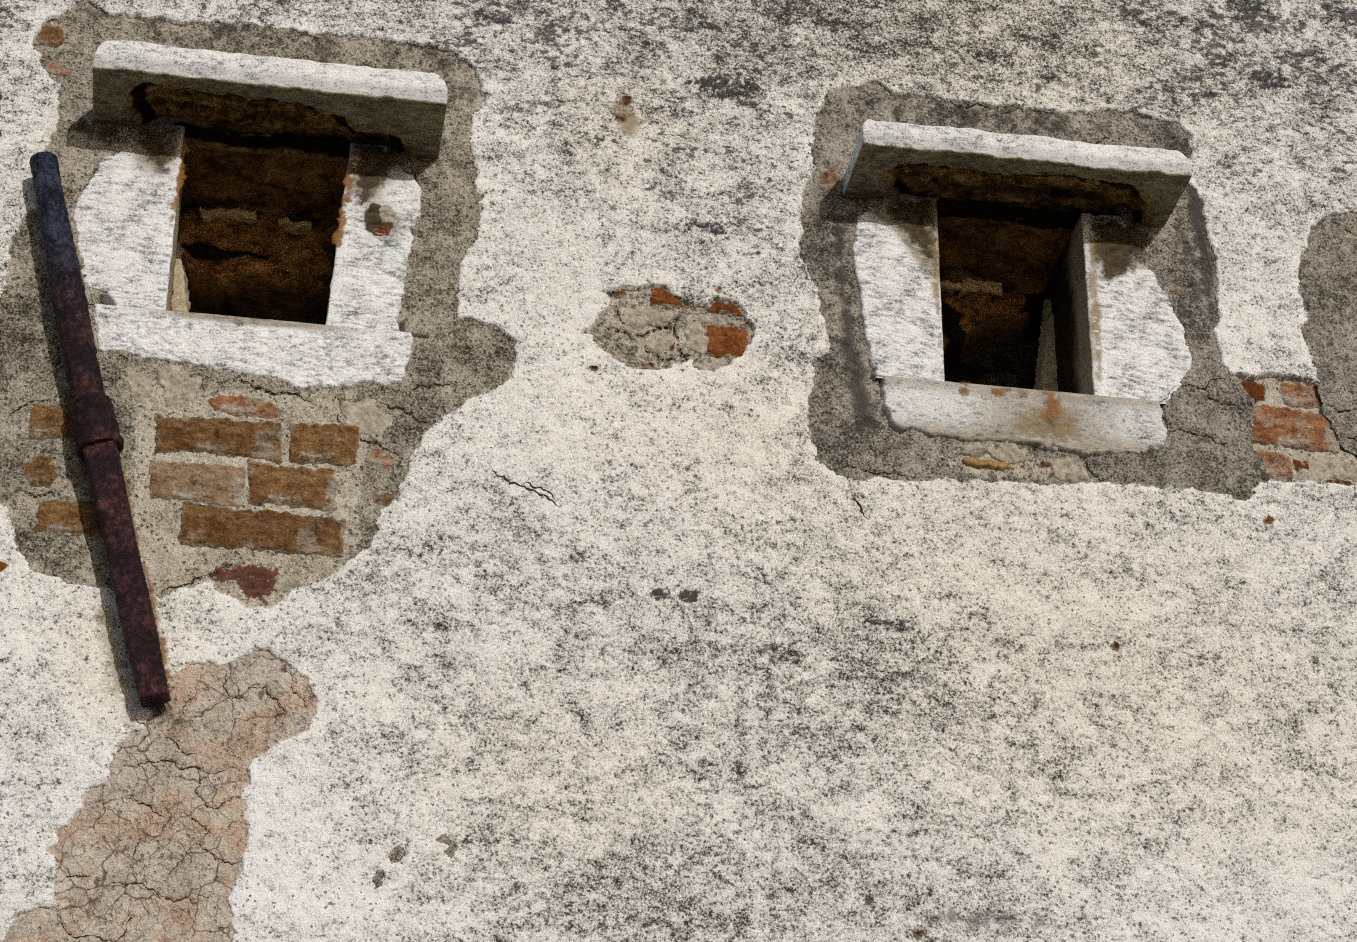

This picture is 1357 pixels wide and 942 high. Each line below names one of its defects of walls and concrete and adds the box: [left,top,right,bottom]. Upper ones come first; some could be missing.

spalling [0,210,113,592]
rust [143,567,171,682]
spalling [32,2,516,609]
crack [490,465,556,505]
spalling [583,286,754,373]
spalling [798,82,1357,500]
spalling [6,650,317,942]